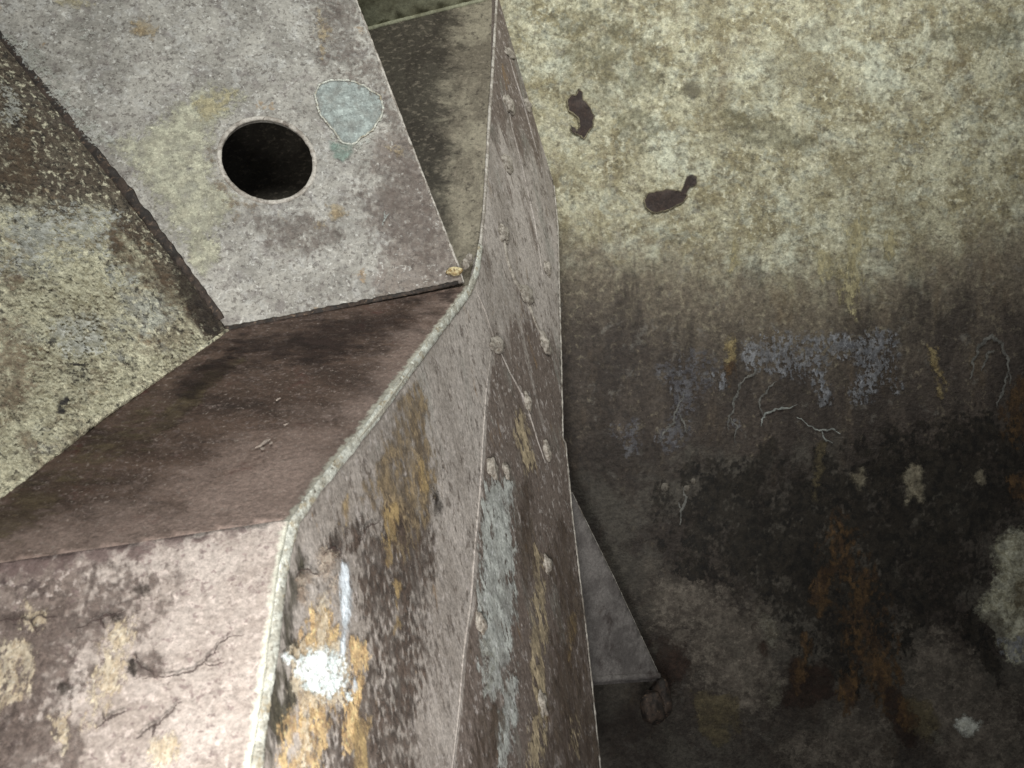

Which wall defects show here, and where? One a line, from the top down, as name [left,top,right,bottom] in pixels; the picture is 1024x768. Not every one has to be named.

crack [660,392,687,442]
crack [727,369,840,443]
damp [743,330,895,406]
crack [969,334,1012,405]
rust [343,380,438,567]
damp [315,515,369,655]
damp [471,408,549,768]
crack [134,634,245,679]
crack [95,711,126,729]
crack [137,702,182,739]